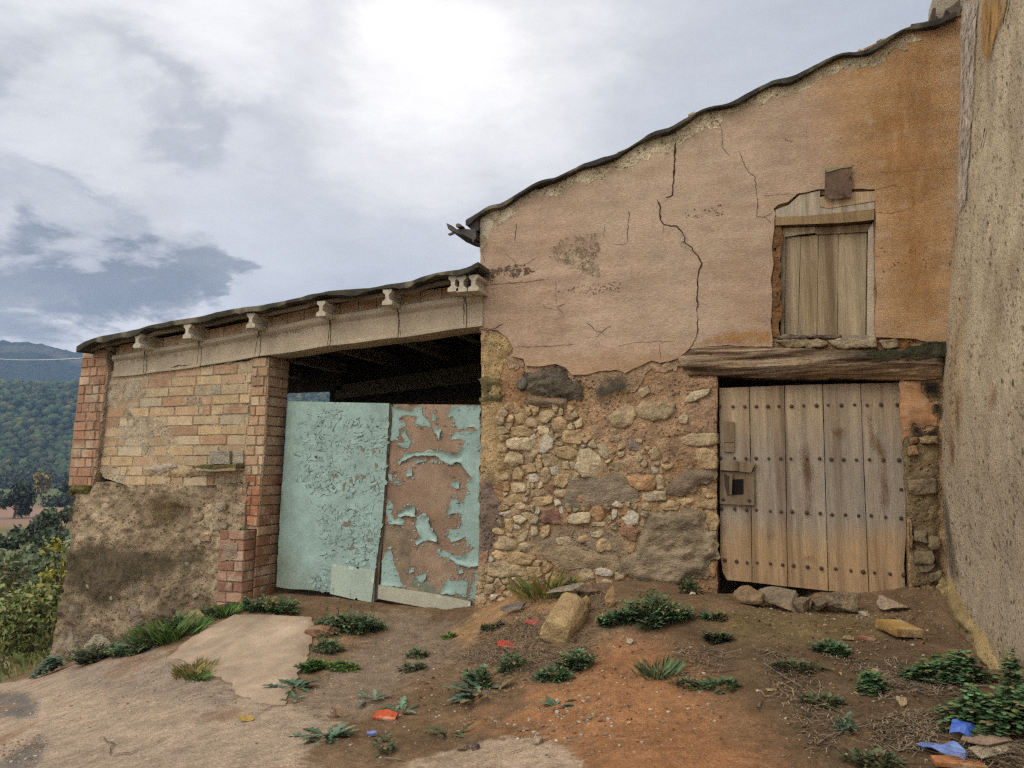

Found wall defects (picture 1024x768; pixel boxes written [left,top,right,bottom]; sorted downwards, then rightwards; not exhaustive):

crack [587,132,703,356]
crack [719,124,795,223]
peeling [294,347,720,606]